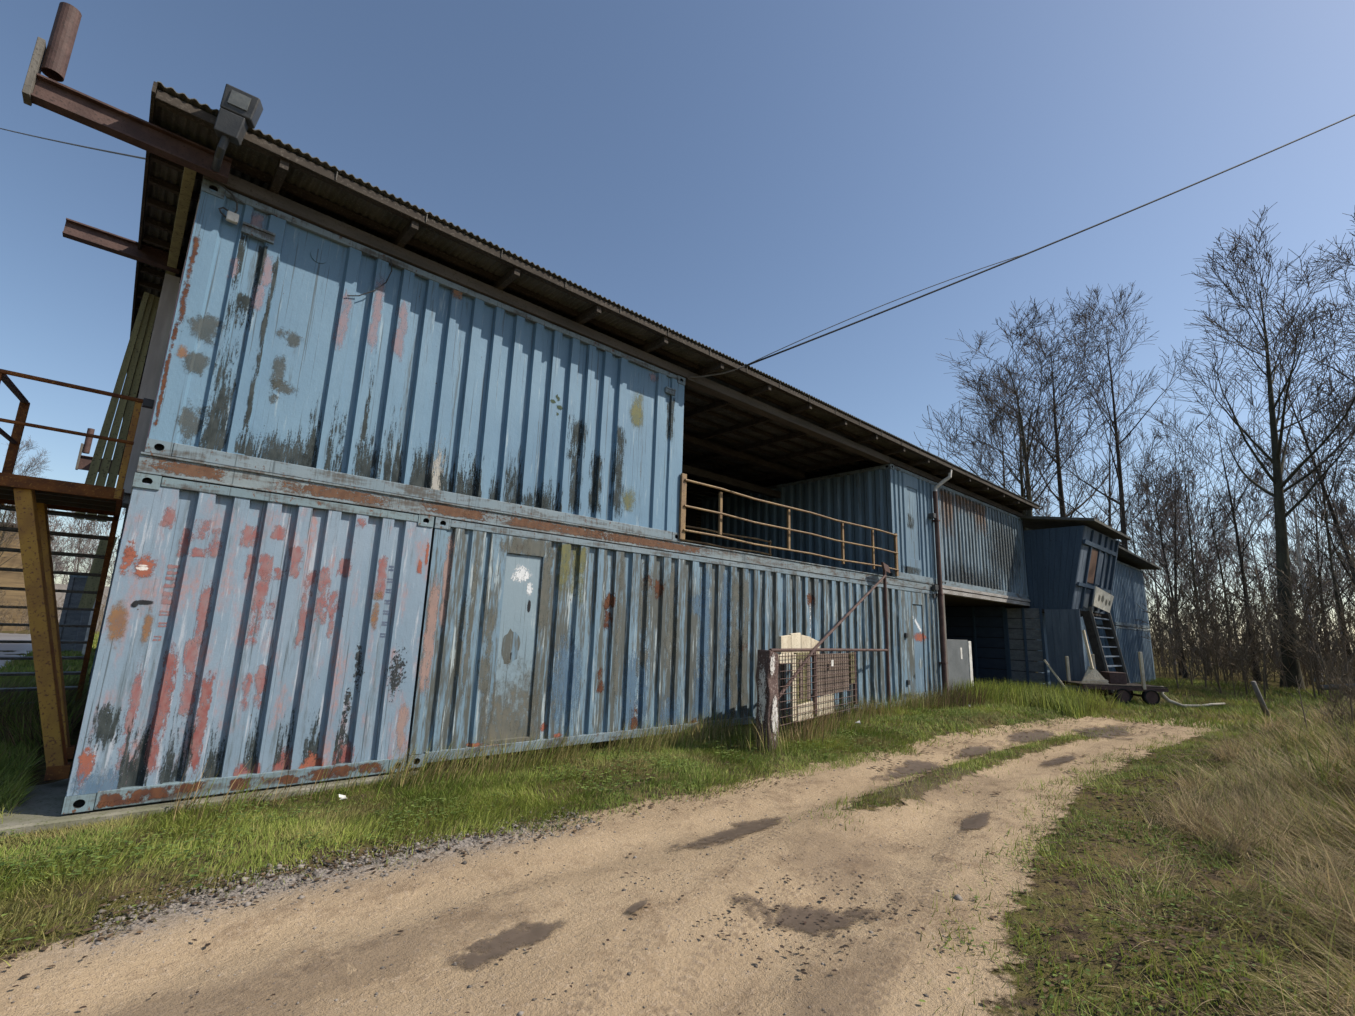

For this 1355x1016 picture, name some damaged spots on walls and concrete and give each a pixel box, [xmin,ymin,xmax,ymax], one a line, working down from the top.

rust [154,235,200,425]
rust [145,457,229,481]
leakage [176,233,627,522]
leakage [666,395,675,440]
rust [97,781,206,808]
leakage [86,702,227,789]
peeling [116,507,222,777]
peeling [240,525,353,644]
leakage [273,645,364,771]
rust [269,762,385,784]
peeling [417,534,496,695]
peeling [725,569,778,740]